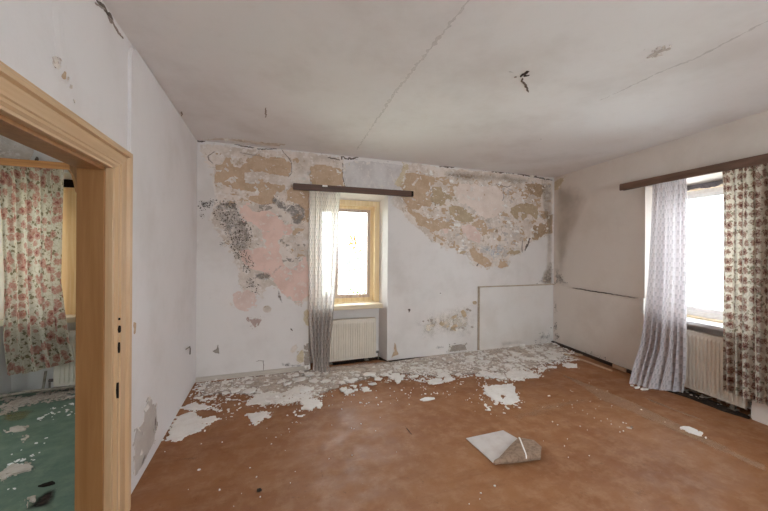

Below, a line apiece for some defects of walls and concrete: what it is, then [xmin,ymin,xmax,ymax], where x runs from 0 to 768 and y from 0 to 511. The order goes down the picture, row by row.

crack [95,0,124,39]
leakage [198,198,270,293]
peeling [199,138,566,331]
peeling [132,396,158,476]